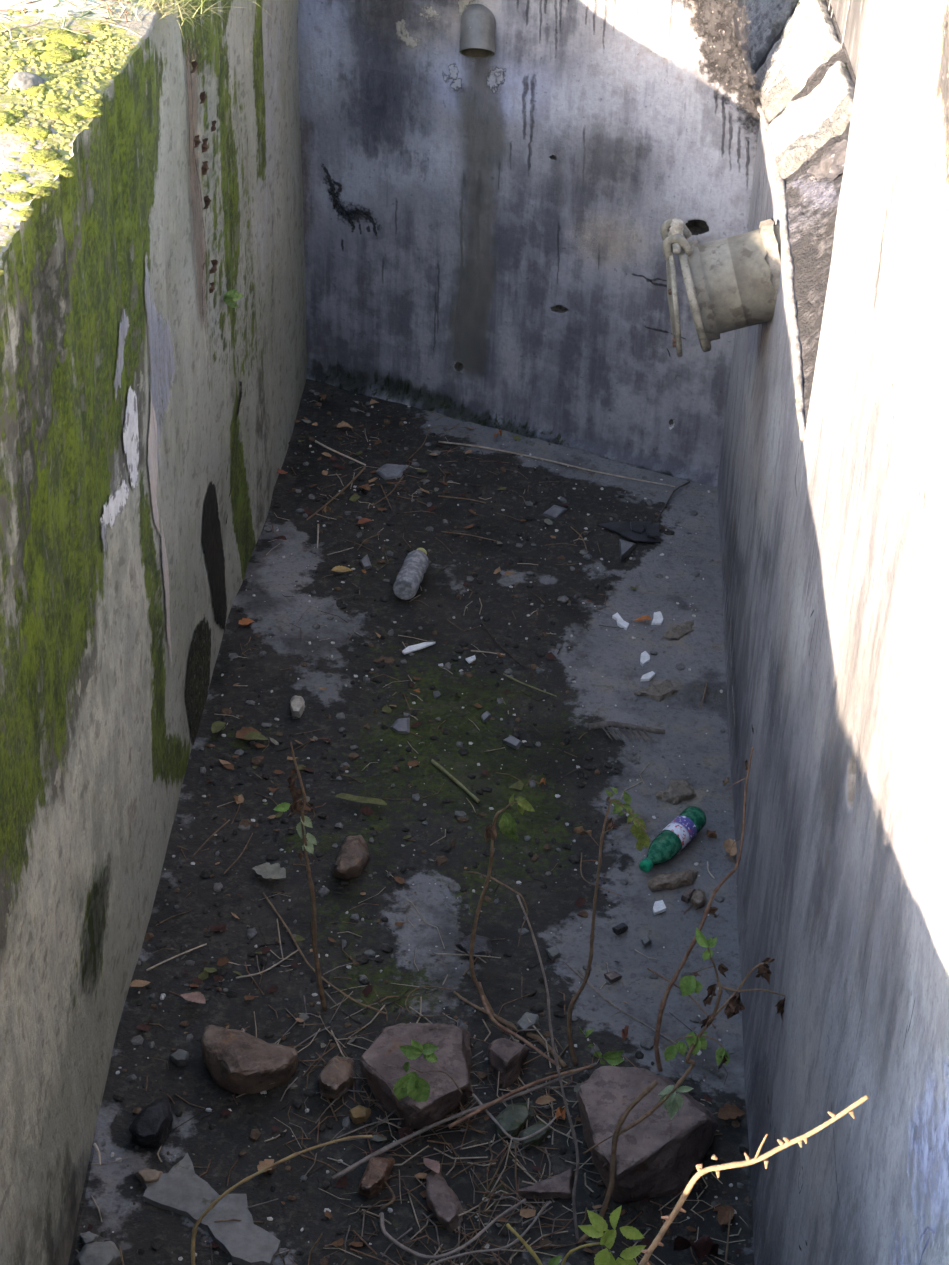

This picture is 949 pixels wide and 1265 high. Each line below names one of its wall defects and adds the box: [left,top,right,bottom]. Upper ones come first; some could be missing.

leakage [517,0,569,49]
leakage [585,0,616,43]
leakage [522,76,535,171]
peeling [935,0,949,184]
leakage [454,58,504,371]